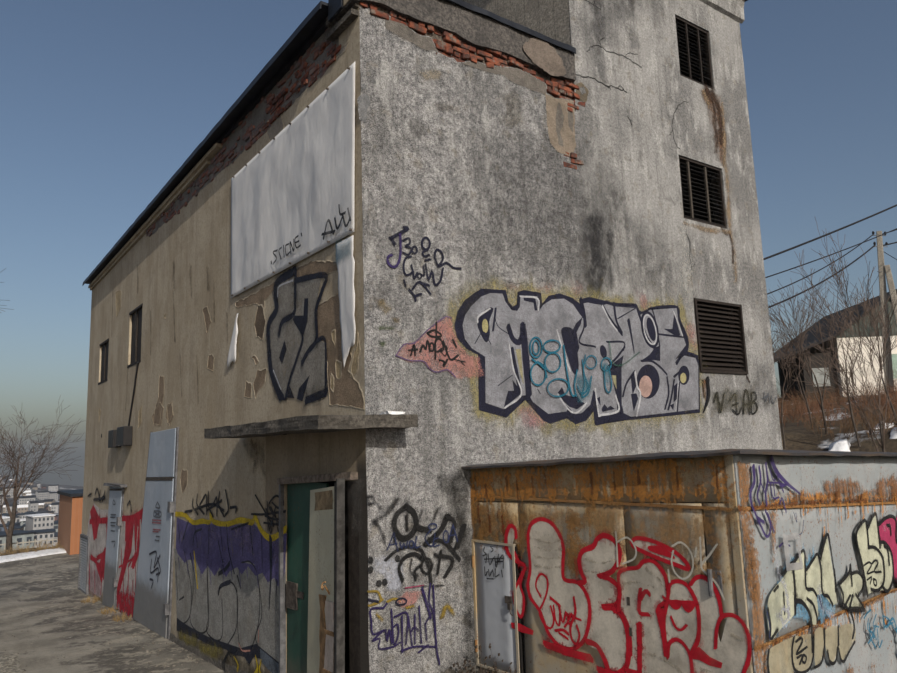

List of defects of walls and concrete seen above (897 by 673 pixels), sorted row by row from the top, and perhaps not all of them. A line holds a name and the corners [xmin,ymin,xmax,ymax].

flaking render [146,28,350,237]
flaking render [359,2,589,170]
crack [580,75,627,93]
crack [587,38,639,66]
corrosion [684,86,736,271]
corrosion [470,451,897,673]